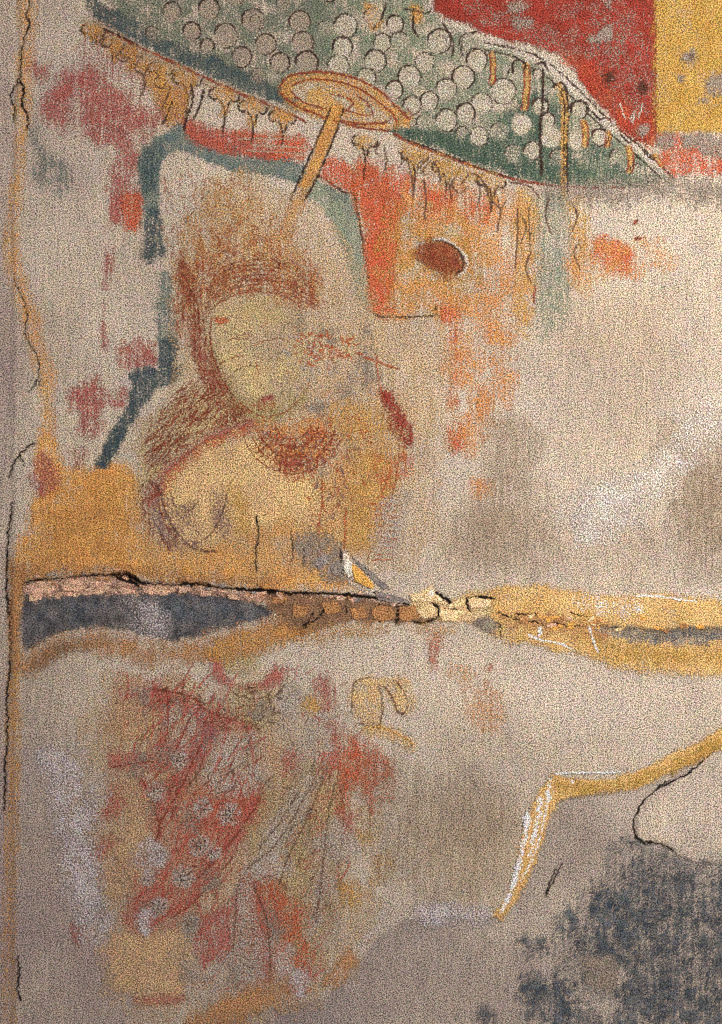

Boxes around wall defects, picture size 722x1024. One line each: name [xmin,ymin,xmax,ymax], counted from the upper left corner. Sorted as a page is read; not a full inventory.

crack [10,0,30,131]
crack [13,278,40,392]
flaking render [17,529,501,651]
crack [3,443,599,810]
crack [633,749,716,851]
crack [15,956,23,1001]
mould [505,834,722,1024]